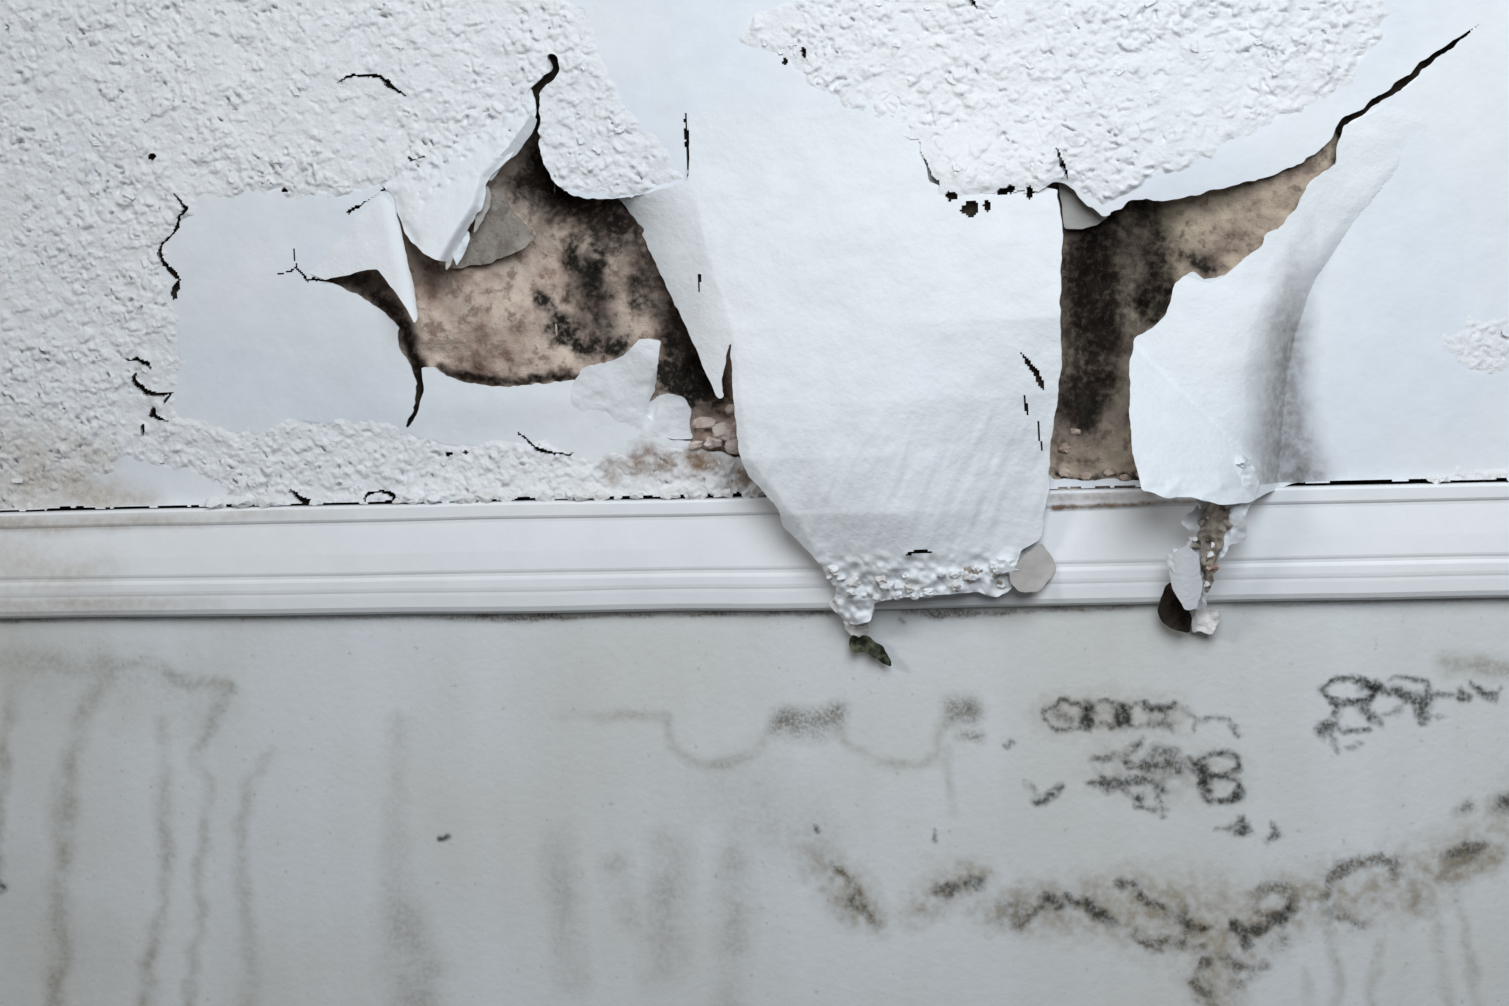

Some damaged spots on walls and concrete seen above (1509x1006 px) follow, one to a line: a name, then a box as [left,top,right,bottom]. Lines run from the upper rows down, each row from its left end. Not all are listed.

crack [531,54,559,112]
crack [1335,28,1473,134]
crack [157,195,188,299]
peeling [0,0,1389,637]
crack [128,357,173,433]
damp [1043,697,1176,731]
damp [1318,676,1493,733]
damp [1088,732,1241,807]
damp [998,892,1111,926]
damp [1117,880,1297,995]
damp [1324,856,1397,895]
damp [1448,842,1495,876]